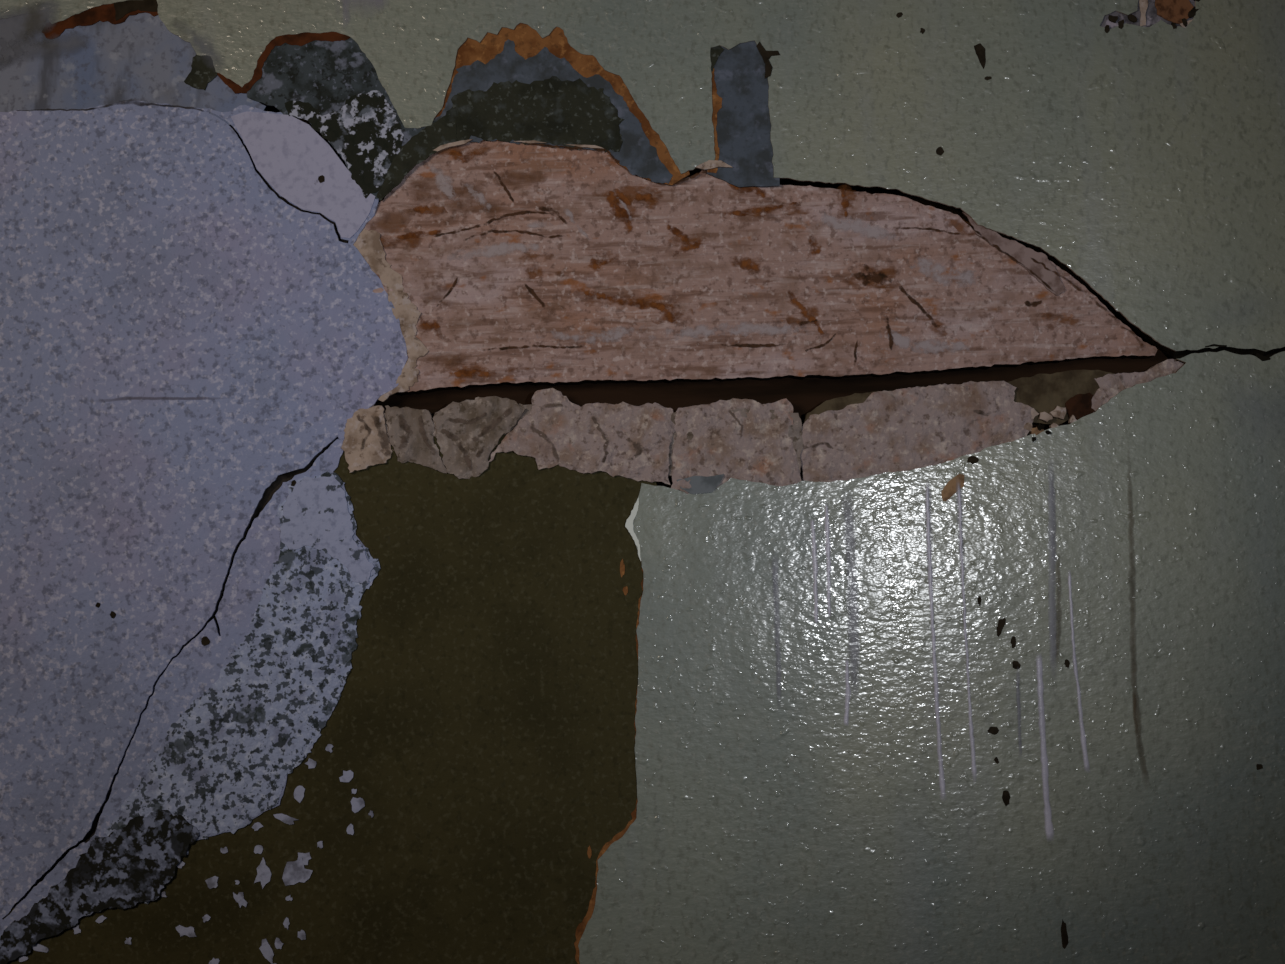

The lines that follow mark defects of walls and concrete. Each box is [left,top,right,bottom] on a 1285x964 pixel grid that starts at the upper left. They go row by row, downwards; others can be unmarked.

crack [17,101,202,111]
crack [229,125,348,243]
flaking render [341,41,1184,494]
peeling [1100,0,1200,33]
crack [1173,344,1285,361]
flaking render [0,0,690,964]
peeling [941,474,964,501]
crack [13,437,339,908]
damp [926,488,945,794]
peeling [996,618,1021,669]
damp [1037,658,1053,837]
damp [1068,575,1089,767]